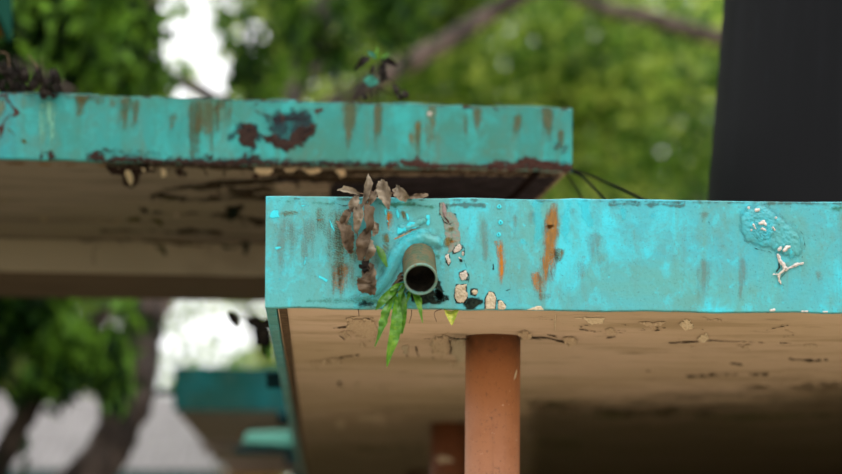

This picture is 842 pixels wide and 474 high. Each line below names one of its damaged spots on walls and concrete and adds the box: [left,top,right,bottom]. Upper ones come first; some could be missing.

rust [86,96,573,173]
spalling [105,163,559,207]
peeling [384,209,416,234]
peeling [426,202,506,310]
rust [531,203,563,299]